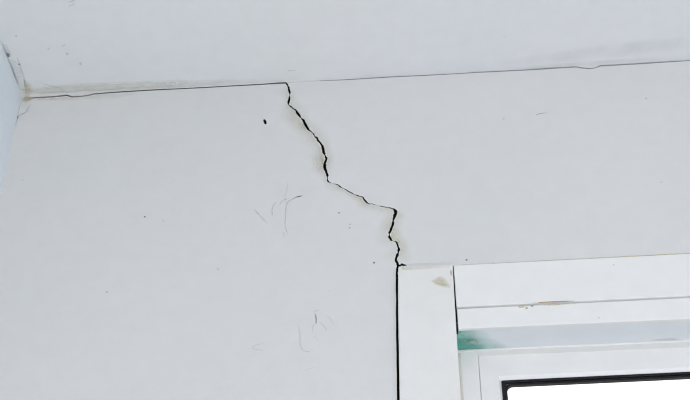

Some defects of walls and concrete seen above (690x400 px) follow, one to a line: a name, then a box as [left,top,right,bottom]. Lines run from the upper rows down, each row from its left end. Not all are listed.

crack [25,82,407,400]